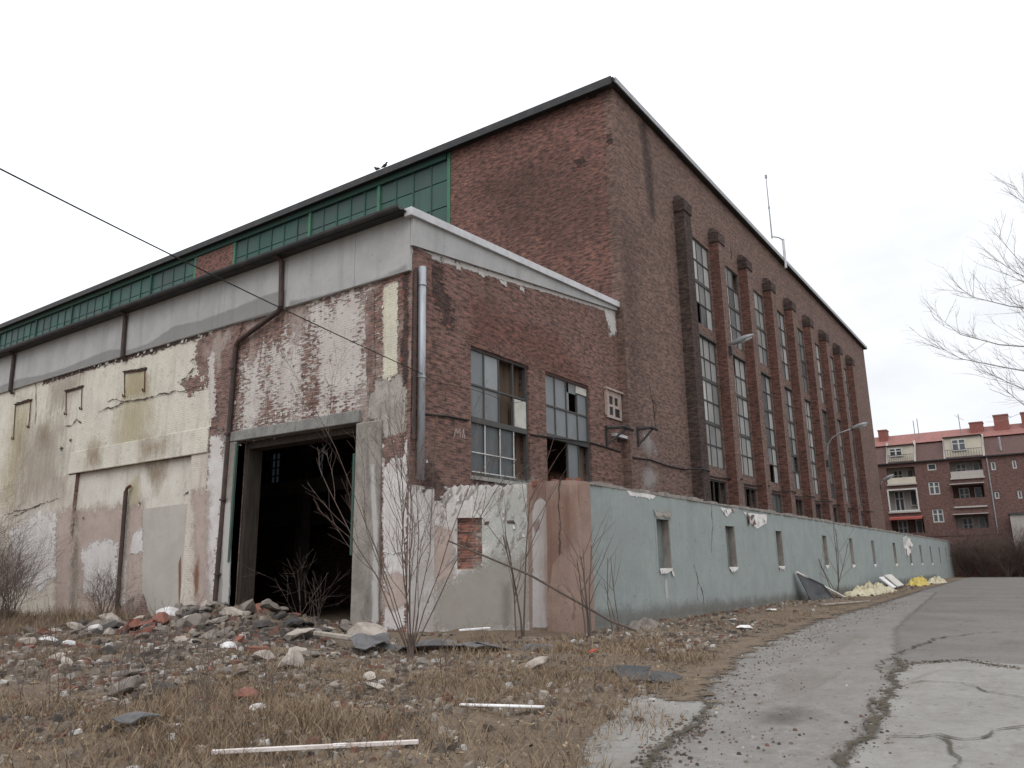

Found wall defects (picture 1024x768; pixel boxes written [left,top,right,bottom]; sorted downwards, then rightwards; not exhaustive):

spalling [412,247,617,337]
crack [67,368,198,427]
peeling [42,272,409,631]
peeling [421,460,481,583]
spalling [721,507,767,529]
spalling [896,535,933,566]